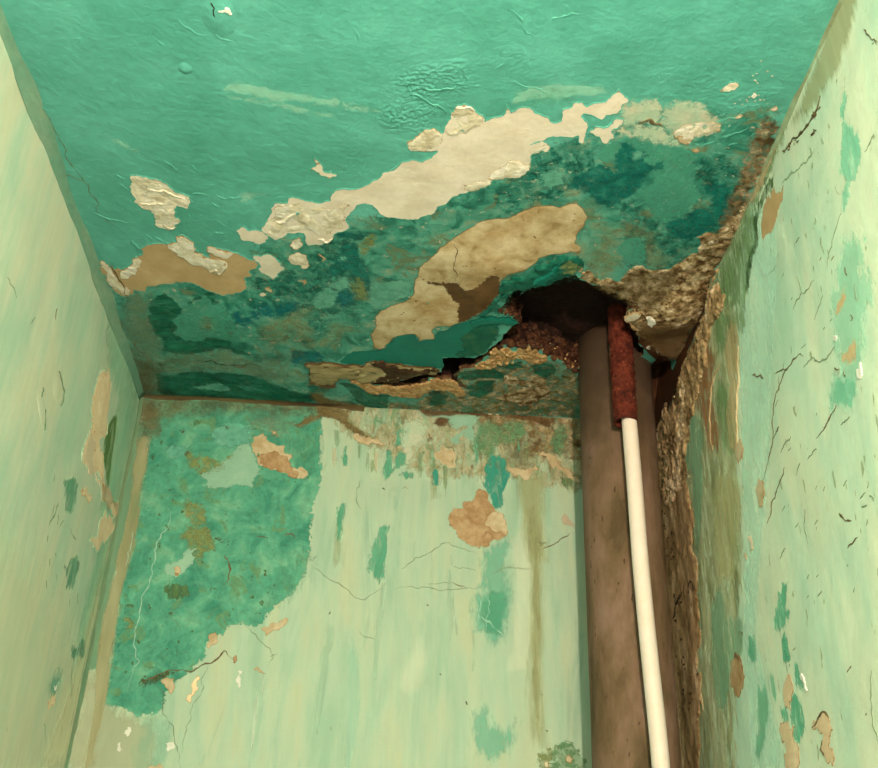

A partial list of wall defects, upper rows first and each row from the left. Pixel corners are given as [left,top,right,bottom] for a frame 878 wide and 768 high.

peeling [100,89,721,297]
crack [782,96,821,183]
leakage [104,416,117,486]
peeling [69,368,164,768]
peeling [304,203,588,398]
leakage [113,105,779,727]
peeling [447,488,509,549]
flaking render [579,210,745,768]
crack [752,214,850,542]
crack [815,480,874,566]
crack [138,650,233,764]
crack [847,666,878,742]